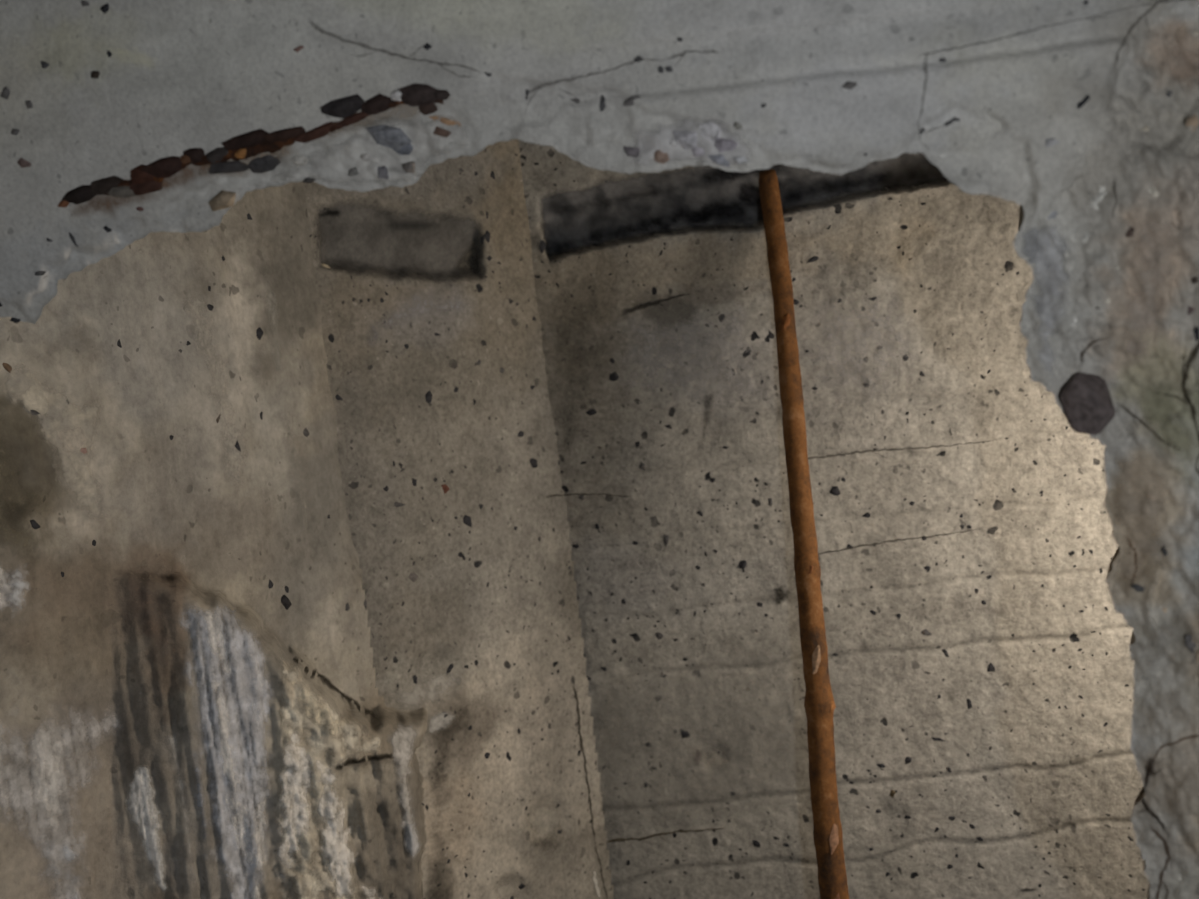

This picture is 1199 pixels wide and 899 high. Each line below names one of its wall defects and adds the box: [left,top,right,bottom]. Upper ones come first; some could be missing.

crack [1116,0,1174,62]
spalling [209,191,236,211]
corrosion [57,83,450,210]
spalling [272,116,467,183]
spalling [391,89,402,101]
peeling [6,366,101,517]
crack [1126,344,1199,473]
leakage [0,568,28,608]
leakage [0,714,116,899]
leakage [129,768,166,890]
leakage [186,607,418,899]
crack [1142,736,1198,899]